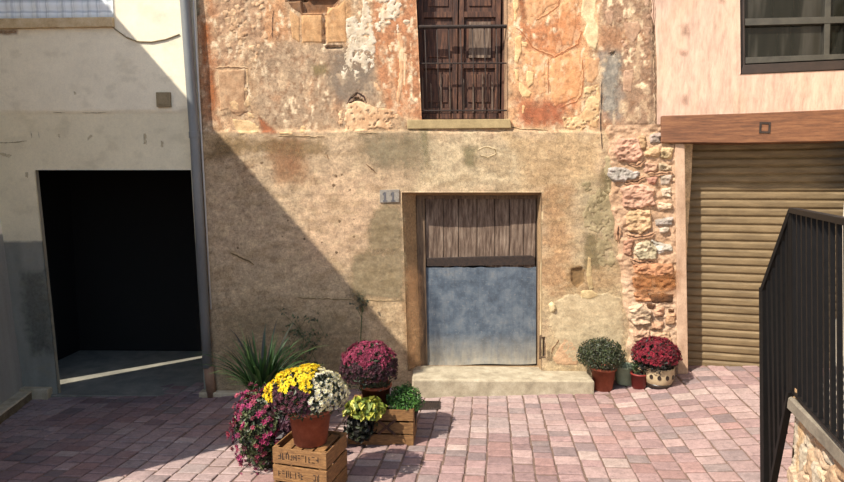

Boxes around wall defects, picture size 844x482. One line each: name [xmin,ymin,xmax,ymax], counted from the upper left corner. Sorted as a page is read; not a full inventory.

spalling [285,0,340,16]
peeling [338,0,413,132]